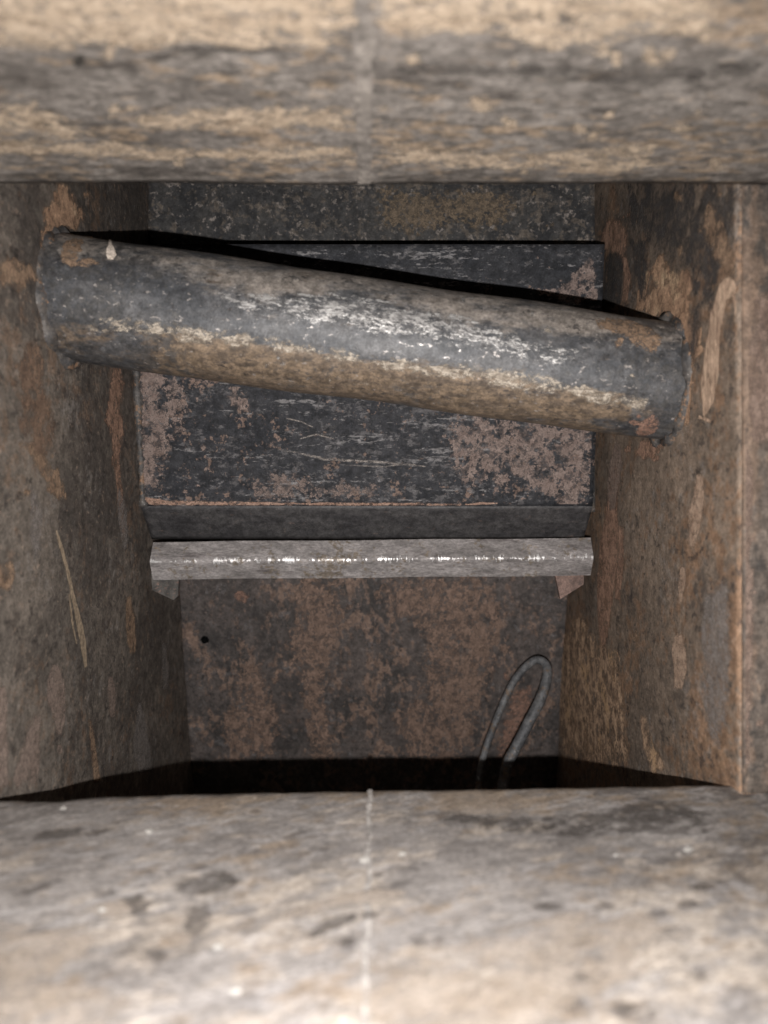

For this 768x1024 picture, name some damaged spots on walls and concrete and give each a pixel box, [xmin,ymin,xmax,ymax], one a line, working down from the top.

corrosion [221,578,353,762]
corrosion [374,577,510,763]
corrosion [496,686,531,759]